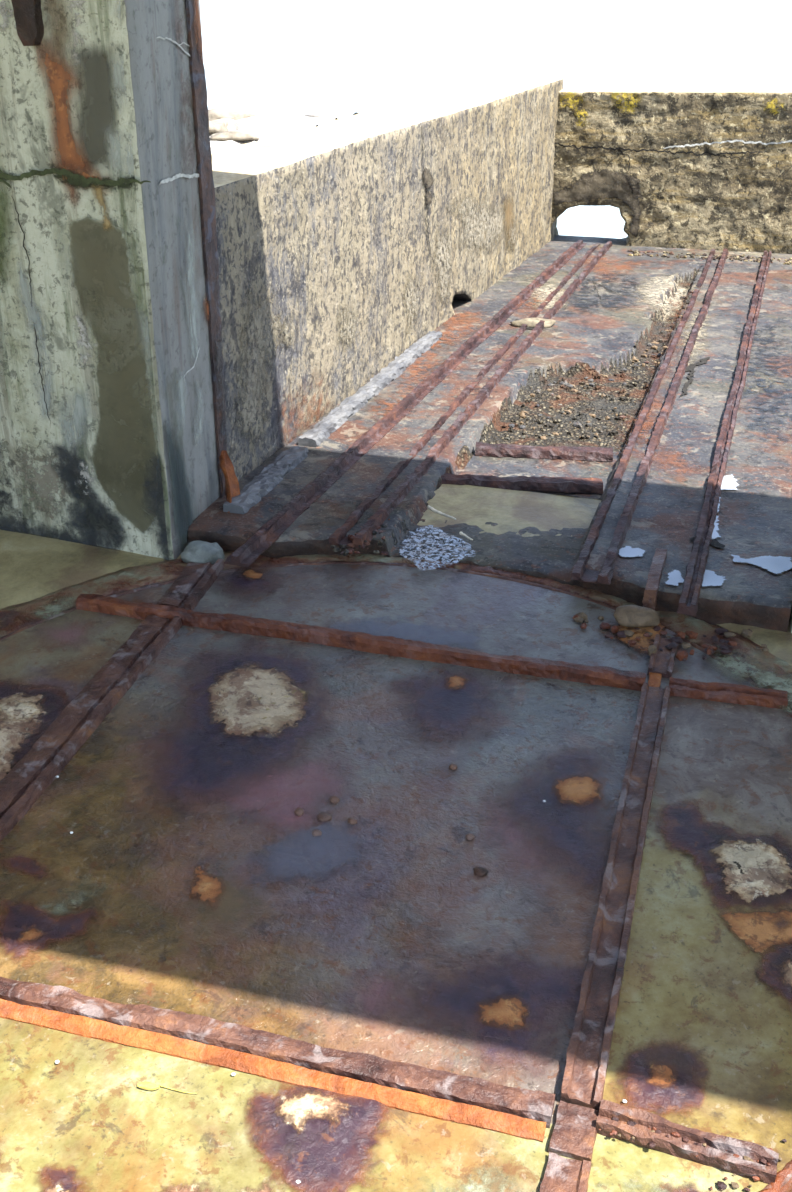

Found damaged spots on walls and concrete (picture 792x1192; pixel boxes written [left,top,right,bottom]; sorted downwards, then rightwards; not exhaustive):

rust [37,45,112,229]
spalling [554,168,644,237]
crack [554,140,792,172]
crack [0,168,199,424]
leakage [0,217,194,561]
rust [504,750,607,886]
rust [0,900,95,959]
rust [656,802,792,1005]
rust [416,957,585,1065]
rust [617,1042,709,1114]
rust [40,1166,85,1192]
rust [246,1084,389,1192]